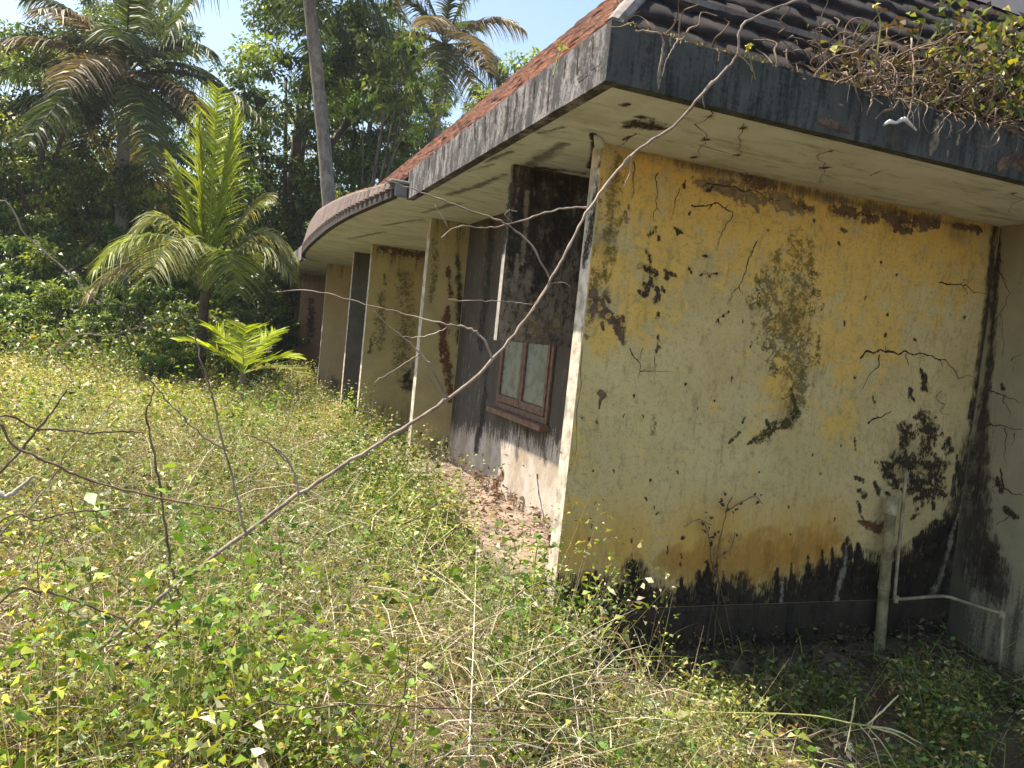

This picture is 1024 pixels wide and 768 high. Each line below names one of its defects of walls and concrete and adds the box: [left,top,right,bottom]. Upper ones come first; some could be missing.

damp [473,81,535,142]
crack [620,133,733,245]
damp [400,363,415,391]
rust [437,266,454,404]
damp [474,369,487,453]
damp [360,133,609,353]
spalling [588,285,627,346]
peeling [637,227,718,317]
crack [716,241,758,323]
damp [554,226,1019,611]
crack [860,347,1023,525]